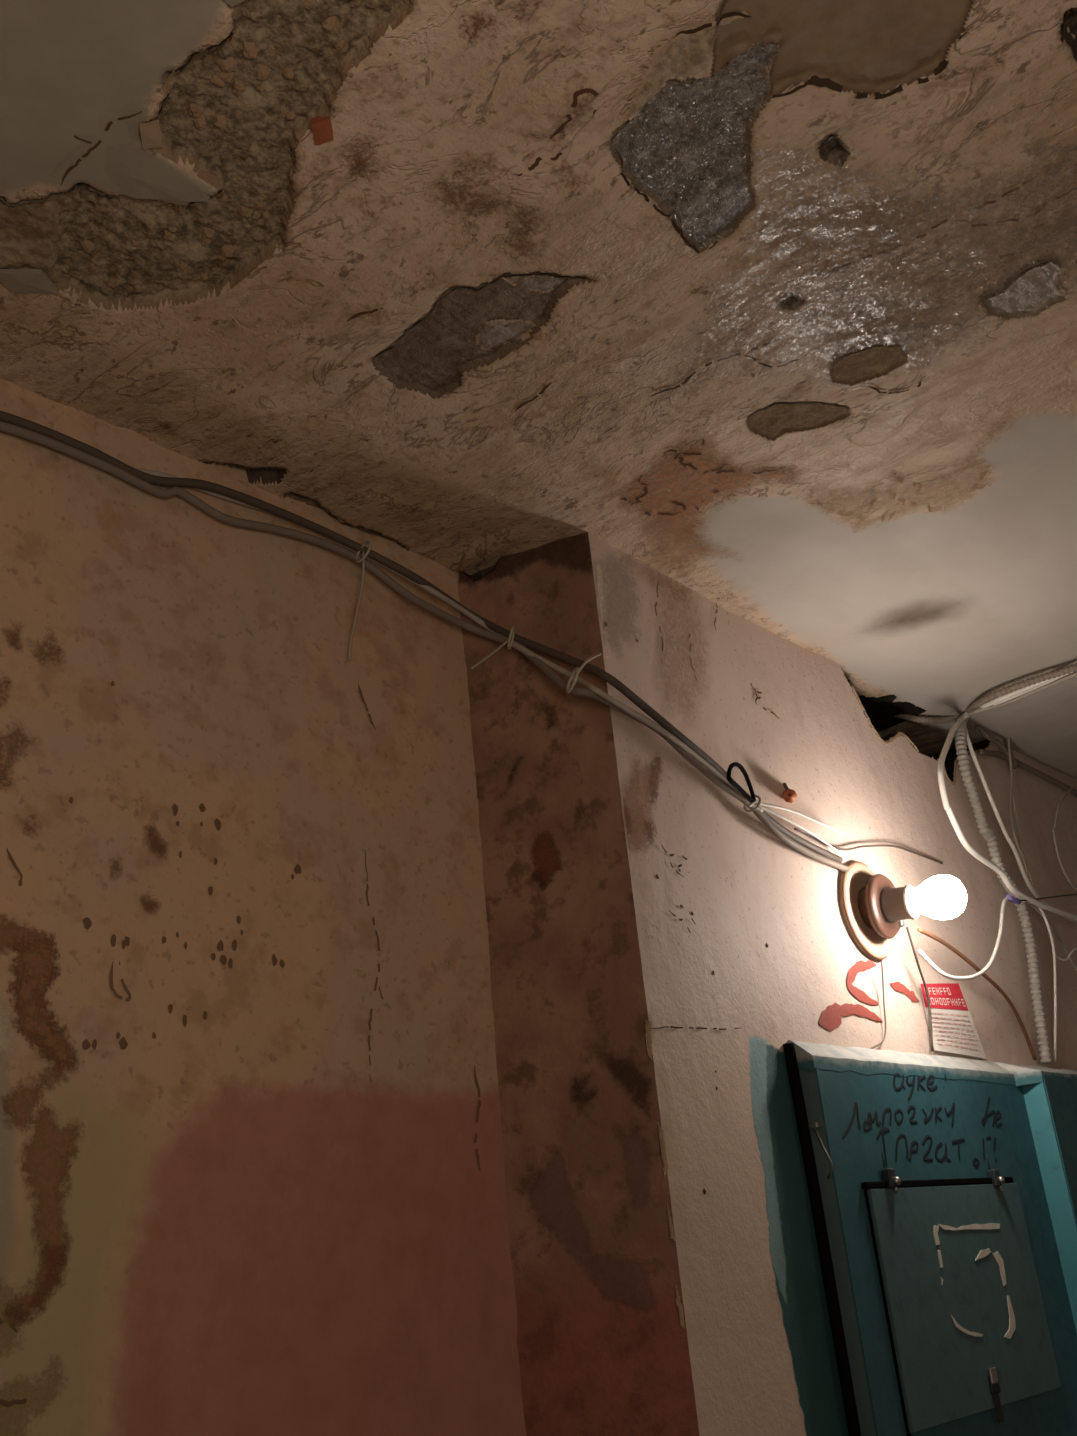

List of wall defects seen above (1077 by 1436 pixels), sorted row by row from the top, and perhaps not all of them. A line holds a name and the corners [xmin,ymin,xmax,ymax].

spalling [0,0,414,311]
spalling [609,0,974,254]
spalling [373,273,597,400]
spalling [747,403,852,441]
spalling [829,346,908,386]
damp [694,146,1077,367]
spalling [981,262,1068,320]